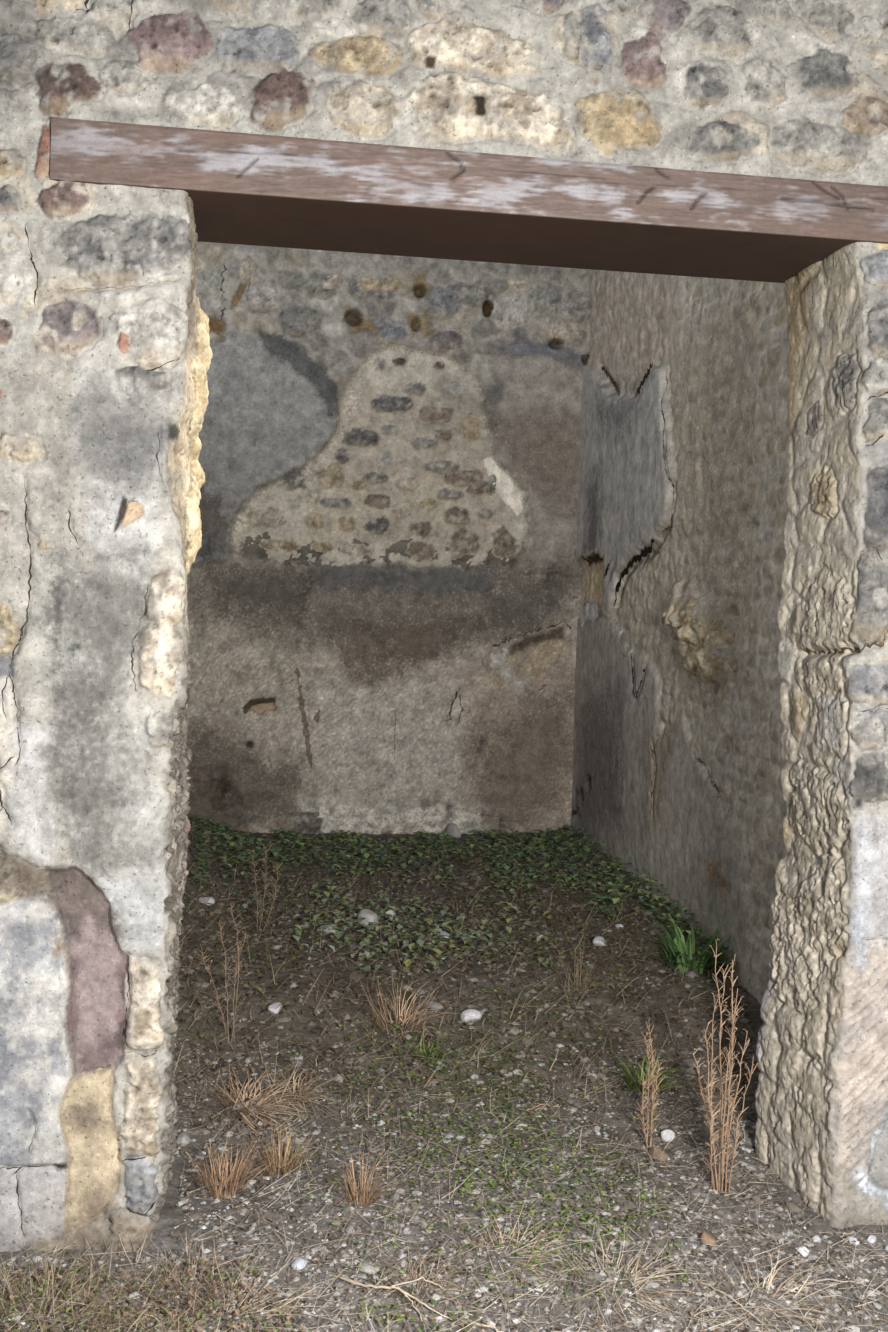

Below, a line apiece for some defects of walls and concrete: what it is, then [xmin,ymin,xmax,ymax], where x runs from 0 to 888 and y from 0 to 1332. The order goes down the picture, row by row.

crack [0,486,37,825]
spalling [242,698,276,715]
spalling [228,344,529,570]
leakage [190,380,602,685]
spalling [583,552,606,621]
peeling [50,869,127,1233]
crack [0,1114,53,1235]